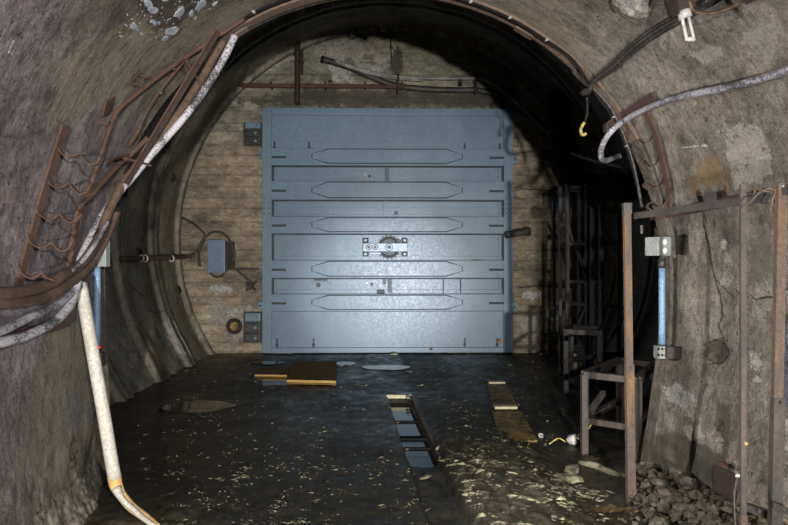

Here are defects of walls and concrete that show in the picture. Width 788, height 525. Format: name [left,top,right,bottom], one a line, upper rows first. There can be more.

peeling [119,0,218,42]
spalling [609,0,653,19]
crack [702,219,788,341]